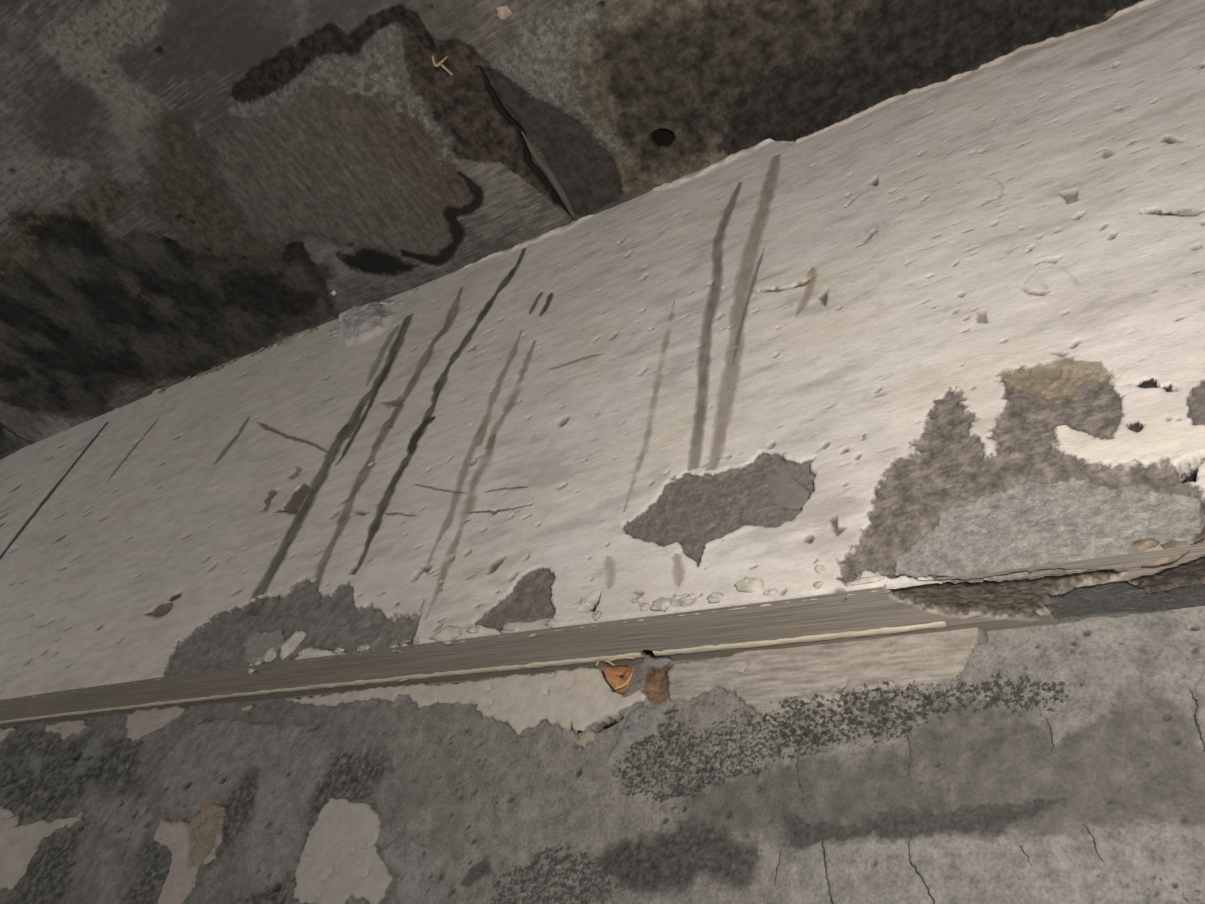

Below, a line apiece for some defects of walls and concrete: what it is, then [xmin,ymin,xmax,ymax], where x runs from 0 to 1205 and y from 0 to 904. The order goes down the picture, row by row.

leakage [0,23,483,419]
spalling [231,5,561,204]
leakage [490,0,1143,471]
peeling [0,805,83,890]
leakage [246,314,412,616]
peeling [293,798,393,904]
flaking render [164,568,556,681]
leakage [352,248,525,575]
rust [641,666,671,702]
flaking render [623,453,816,567]
leakage [462,670,1205,904]
flaking render [667,358,1205,721]